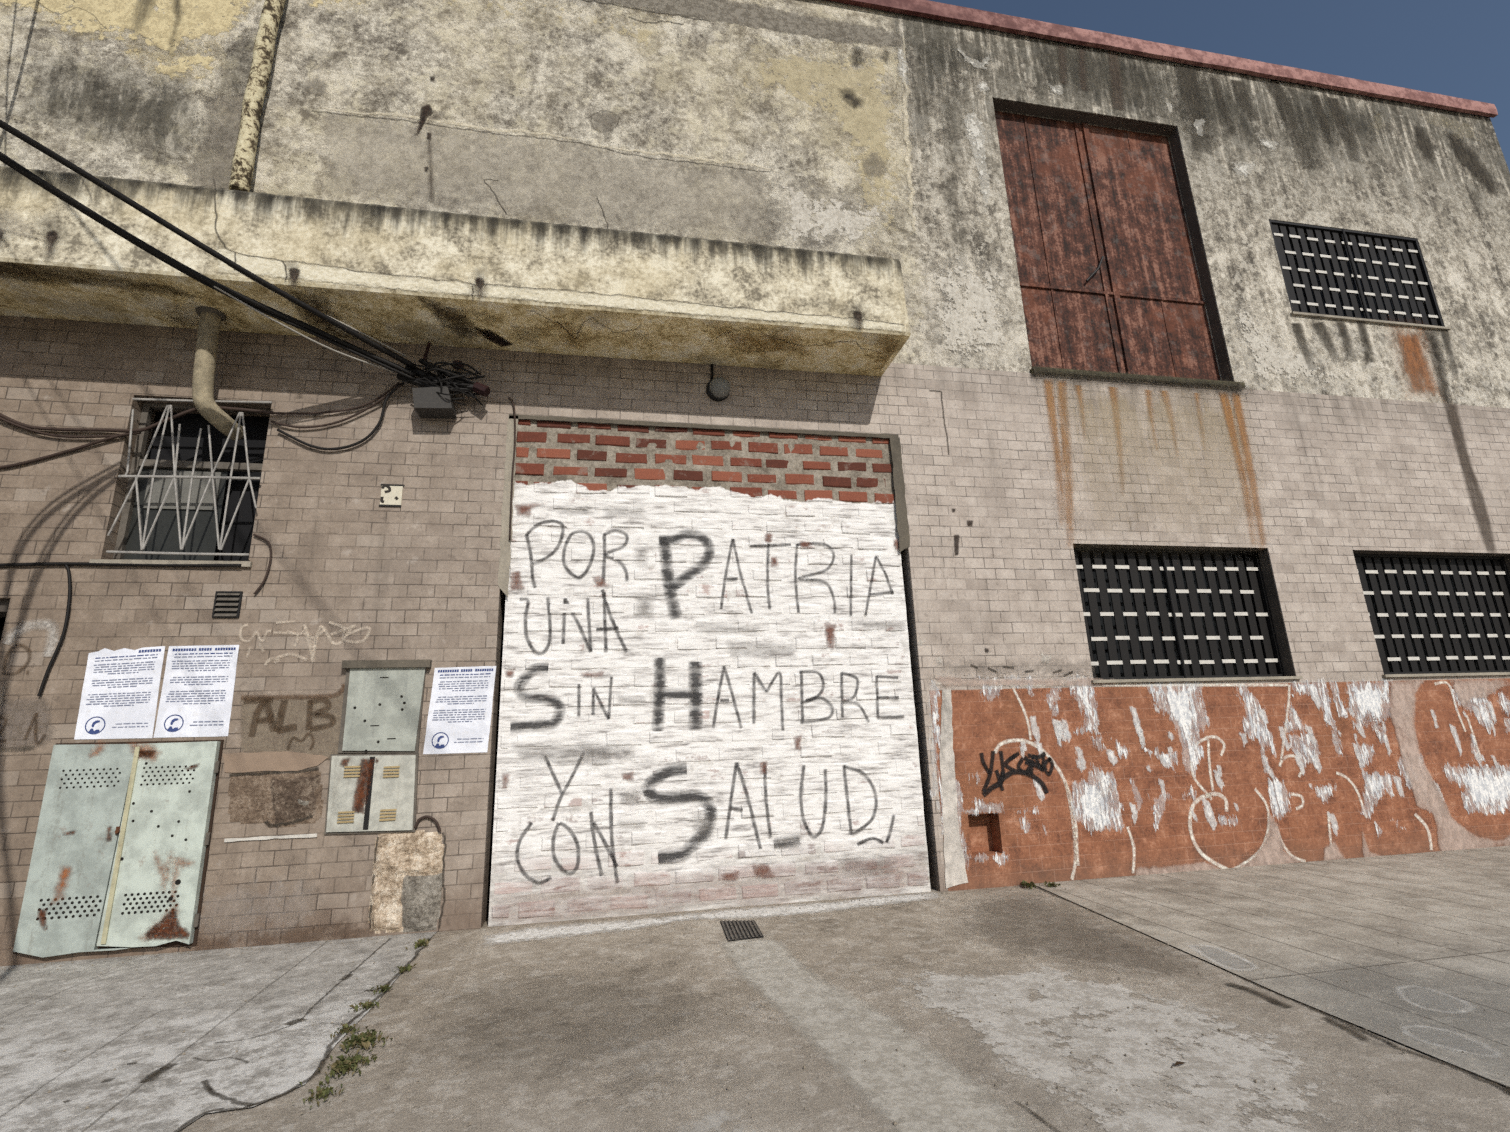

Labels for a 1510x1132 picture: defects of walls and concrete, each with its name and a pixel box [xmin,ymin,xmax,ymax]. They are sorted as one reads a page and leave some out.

peeling [0,0,254,79]
water stain [105,177,311,203]
water stain [1416,126,1432,159]
water stain [1449,134,1495,192]
water stain [539,222,615,240]
water stain [634,232,835,257]
rust [1398,333,1434,392]
rust [1045,381,1083,466]
rust [1221,394,1255,486]
rust [134,746,156,765]
rust [146,869,189,940]
flaking render [368,830,446,934]